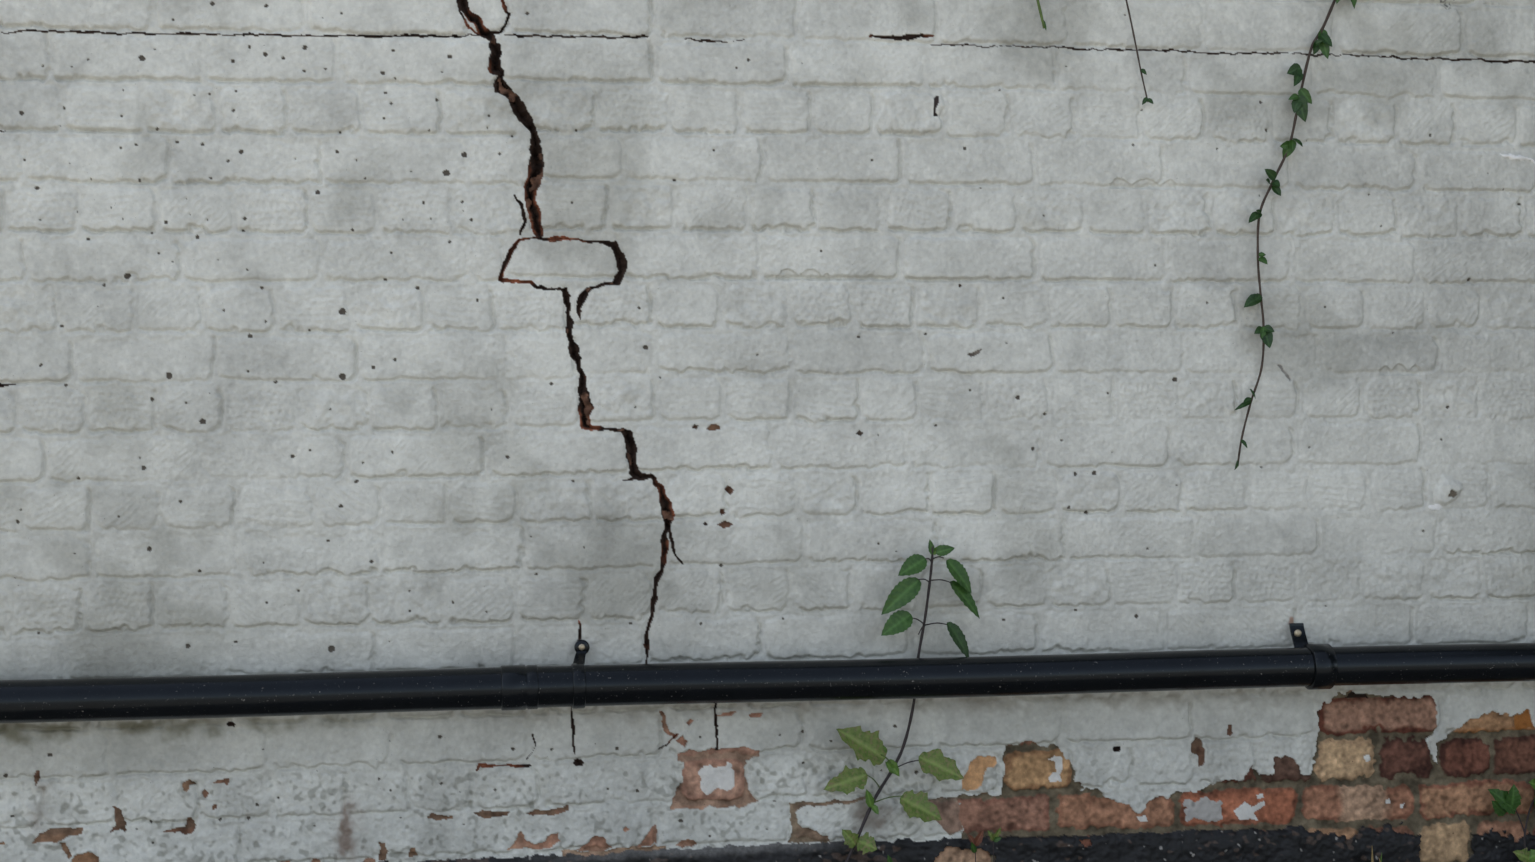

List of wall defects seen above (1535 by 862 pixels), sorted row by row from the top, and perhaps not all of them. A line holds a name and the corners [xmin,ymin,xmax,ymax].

crack [685,36,744,44]
crack [1,0,683,664]
crack [475,707,576,772]
peeling [110,806,196,845]
peeling [182,778,230,821]
peeling [427,809,509,826]
peeling [507,710,866,856]
peeling [928,690,1535,862]
peeling [363,842,388,862]